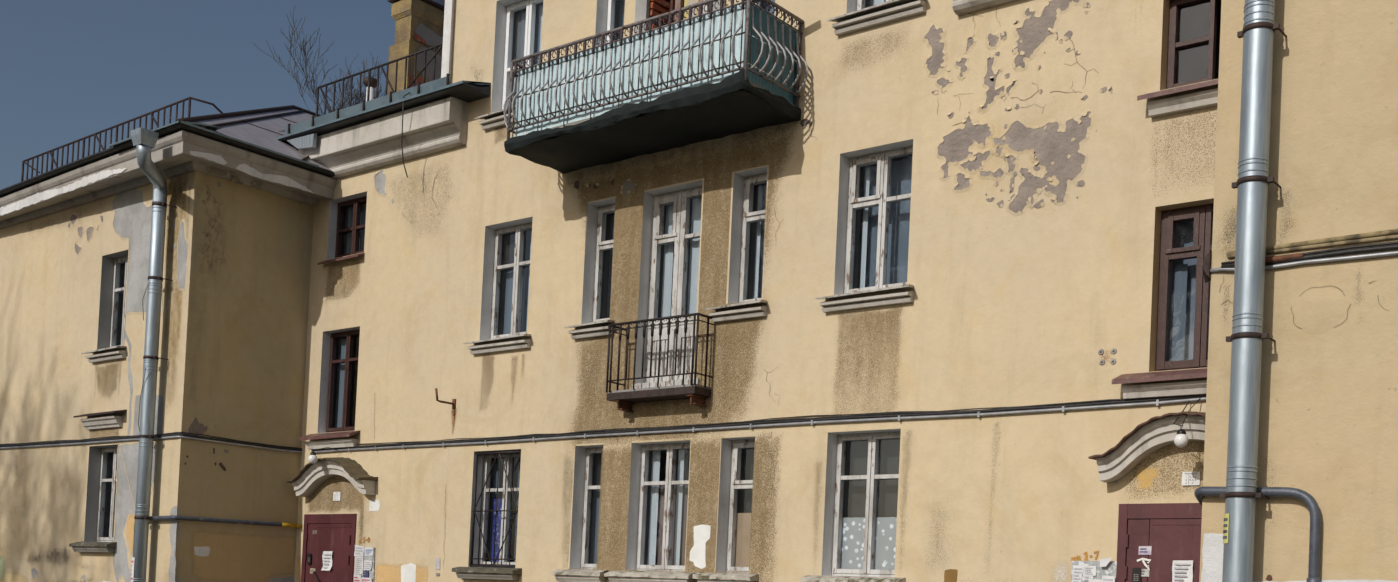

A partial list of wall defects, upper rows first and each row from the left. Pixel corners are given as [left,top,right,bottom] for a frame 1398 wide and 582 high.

peeling [921,0,1113,216]
peeling [0,168,126,215]
spalling [169,213,189,291]
flaking render [68,188,163,582]
leakage [478,354,525,413]
leakage [561,121,800,582]
leakage [831,305,904,416]
flaking render [168,506,183,582]